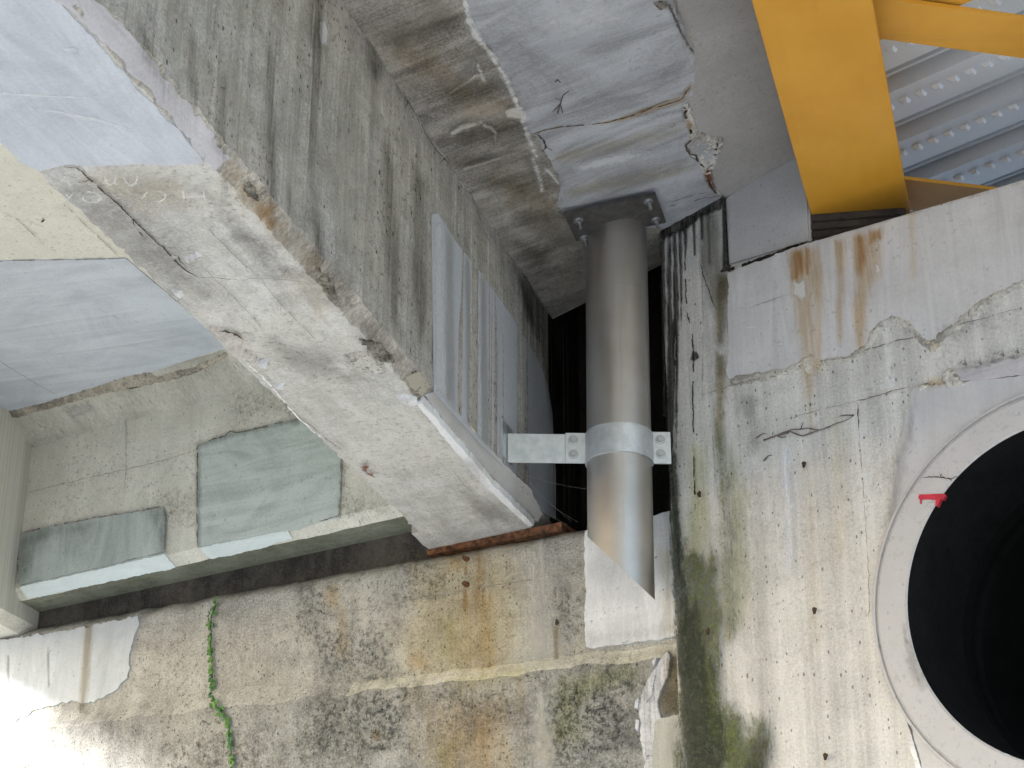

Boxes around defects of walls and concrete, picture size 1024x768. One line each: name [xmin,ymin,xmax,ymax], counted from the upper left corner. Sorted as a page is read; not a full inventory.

crack [532,88,690,151]
spalling [682,103,726,198]
peeling [704,280,1024,395]
water stain [660,197,745,768]
crack [786,387,907,617]
peeling [634,651,672,768]